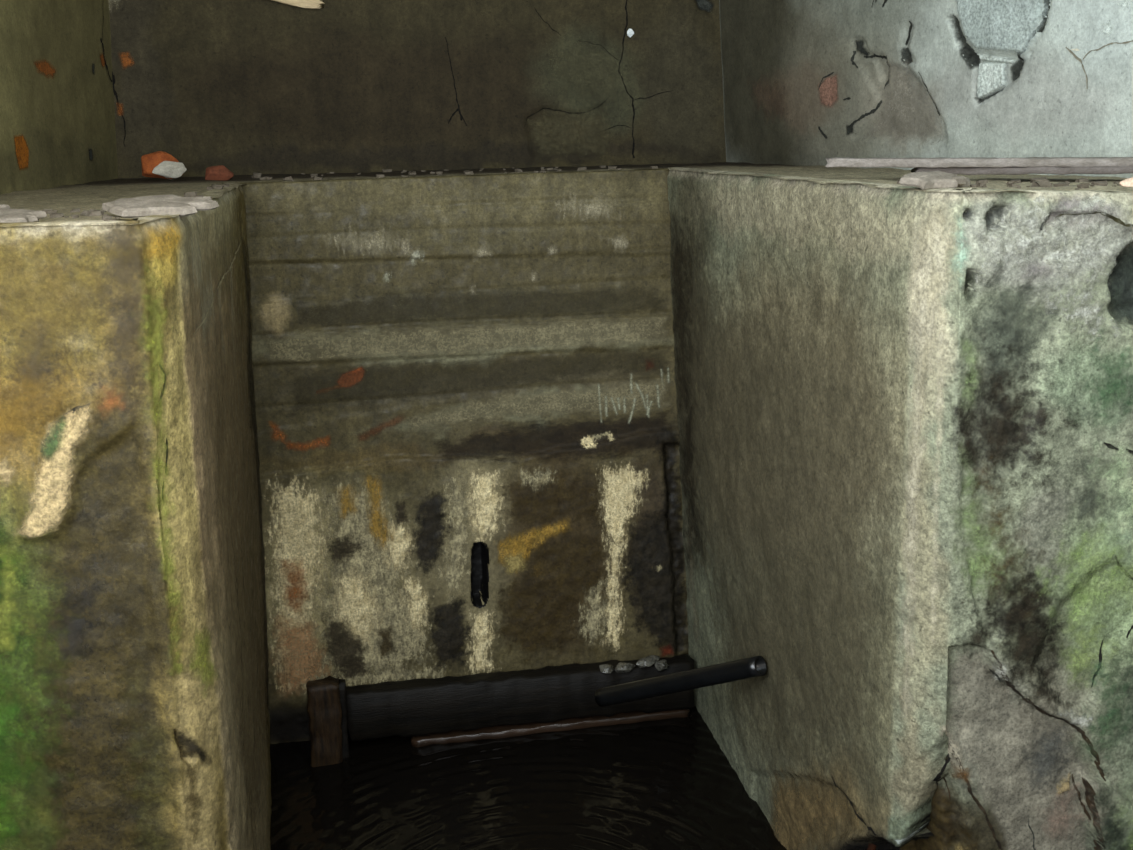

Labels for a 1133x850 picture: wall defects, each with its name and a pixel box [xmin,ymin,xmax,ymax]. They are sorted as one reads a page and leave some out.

crack [445,37,467,126]
crack [534,0,669,158]
spalling [846,21,940,135]
flaking render [951,0,1050,103]
crack [1066,40,1133,89]
leakage [904,197,1133,553]
leakage [35,417,153,850]
spalling [0,185,272,850]
leakage [245,244,704,714]
spalling [222,167,1133,850]
leakage [957,512,1072,708]
crack [1091,625,1133,687]